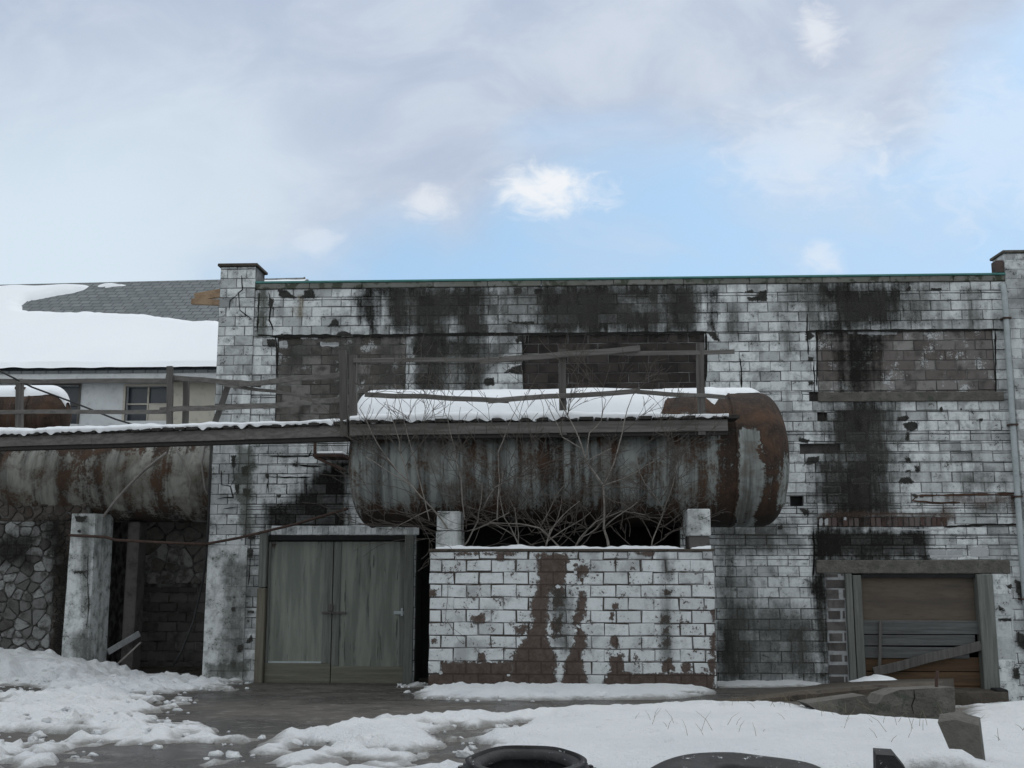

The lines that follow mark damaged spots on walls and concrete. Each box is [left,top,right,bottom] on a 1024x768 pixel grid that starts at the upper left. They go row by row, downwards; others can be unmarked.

crack [229,275,742,387]
water stain [354,285,737,390]
water stain [263,461,351,527]
water stain [716,282,931,681]